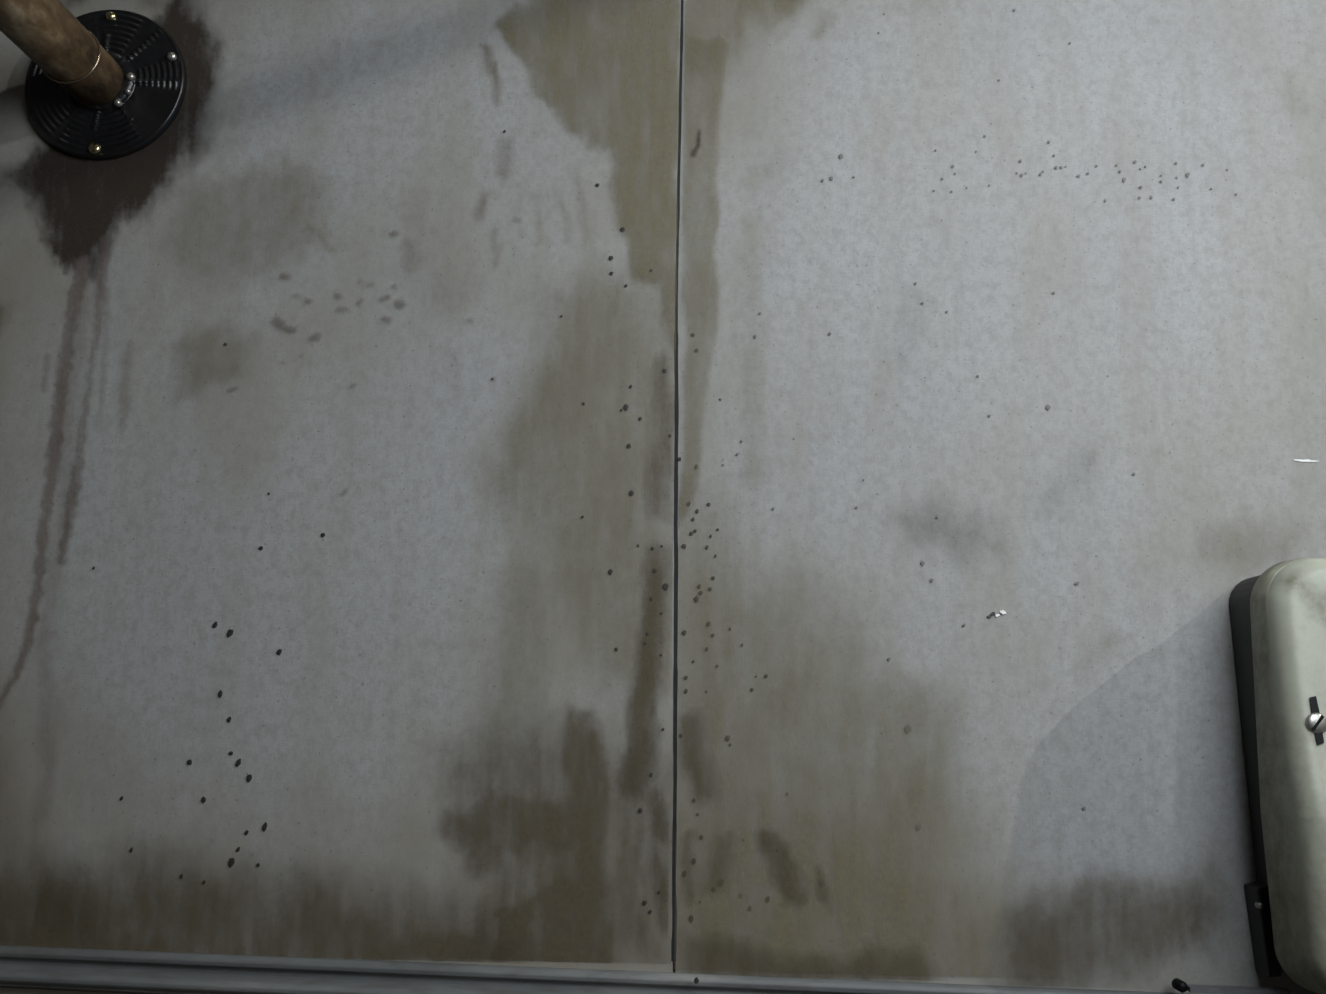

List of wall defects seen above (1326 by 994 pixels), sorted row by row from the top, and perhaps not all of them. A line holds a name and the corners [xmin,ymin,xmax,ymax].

leakage [18,0,215,305]
leakage [499,0,700,306]
leakage [0,714,647,962]